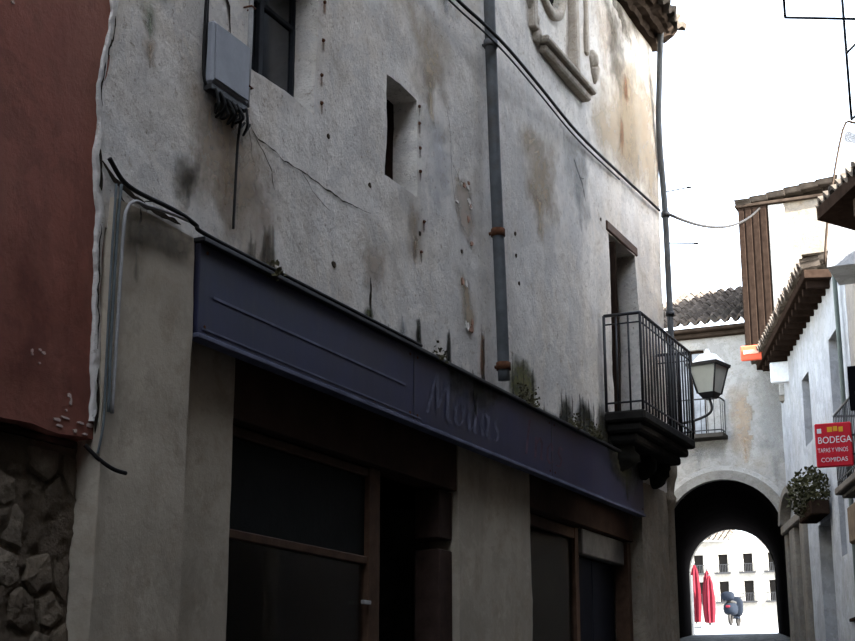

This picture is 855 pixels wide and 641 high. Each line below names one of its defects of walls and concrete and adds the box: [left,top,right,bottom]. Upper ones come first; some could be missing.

water stain [181,168,195,199]
water stain [198,109,256,211]
crack [249,126,369,213]
water stain [365,277,373,318]
peeling [53,393,94,436]
water stain [560,395,613,445]